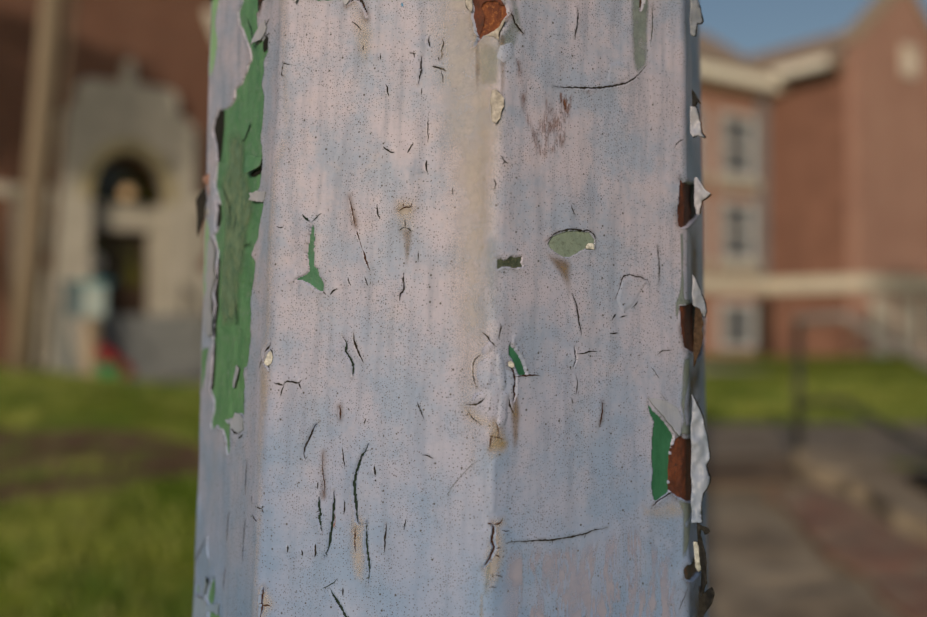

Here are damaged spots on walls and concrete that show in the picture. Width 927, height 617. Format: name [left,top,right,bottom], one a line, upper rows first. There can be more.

rust [473,0,507,42]
crack [555,0,653,89]
peeling [196,0,268,453]
peeling [297,225,324,291]
crack [323,199,370,295]
peeling [694,177,712,215]
peeling [691,275,707,367]
crack [287,419,406,583]
rust [667,436,692,501]
peeling [648,394,715,617]
crack [483,518,608,588]
crack [324,580,347,617]